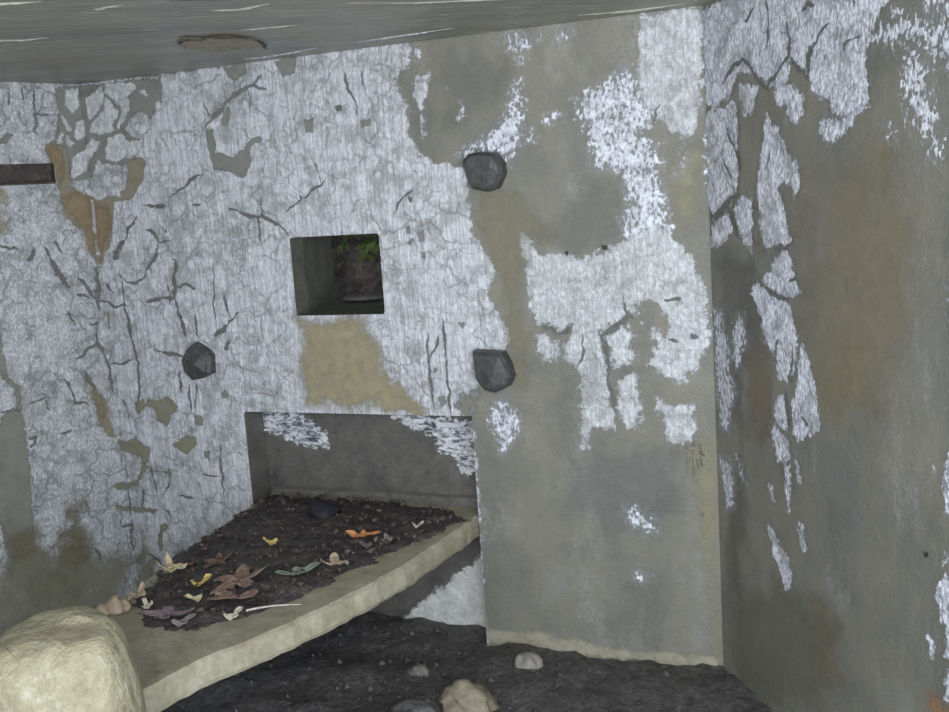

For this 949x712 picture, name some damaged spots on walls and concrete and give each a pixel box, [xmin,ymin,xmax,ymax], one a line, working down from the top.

crack [204,75,267,126]
crack [335,71,366,115]
corrosion [0,146,64,186]
corrosion [63,192,111,252]
crack [228,164,325,241]
crack [394,189,413,214]
crack [0,174,239,417]
peeling [45,0,949,591]
crack [426,318,451,414]
crack [121,466,193,565]
peeling [401,535,489,646]
peeling [926,551,949,702]